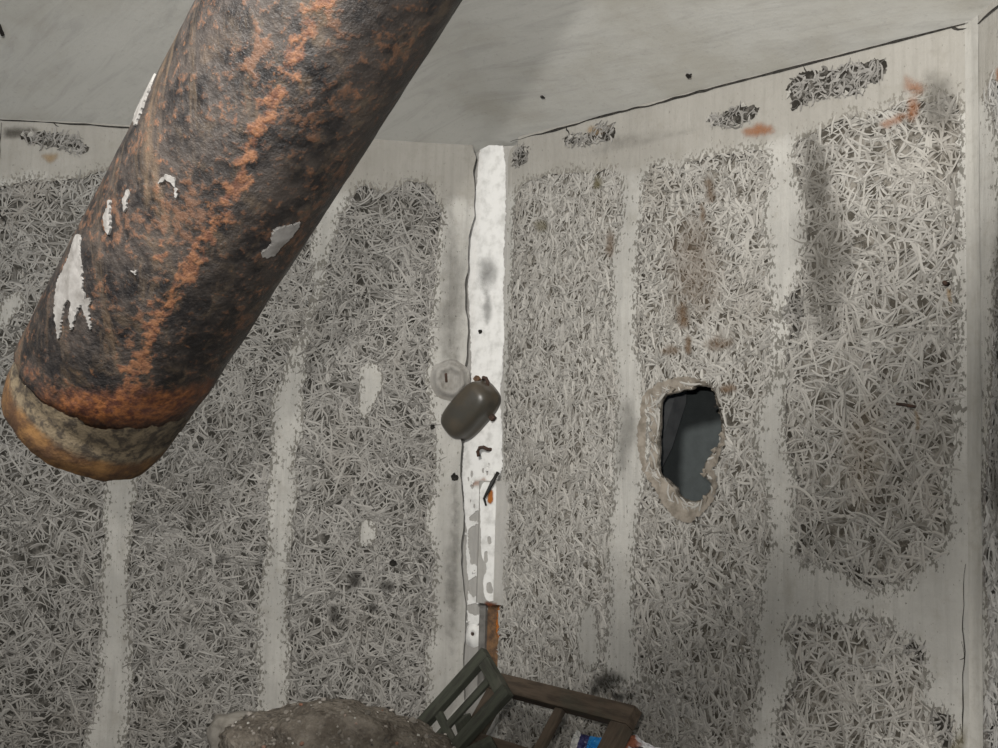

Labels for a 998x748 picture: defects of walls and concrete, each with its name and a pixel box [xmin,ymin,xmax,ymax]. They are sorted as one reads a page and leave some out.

spalling [786,57,887,111]
spalling [705,101,760,129]
spalling [636,376,726,523]